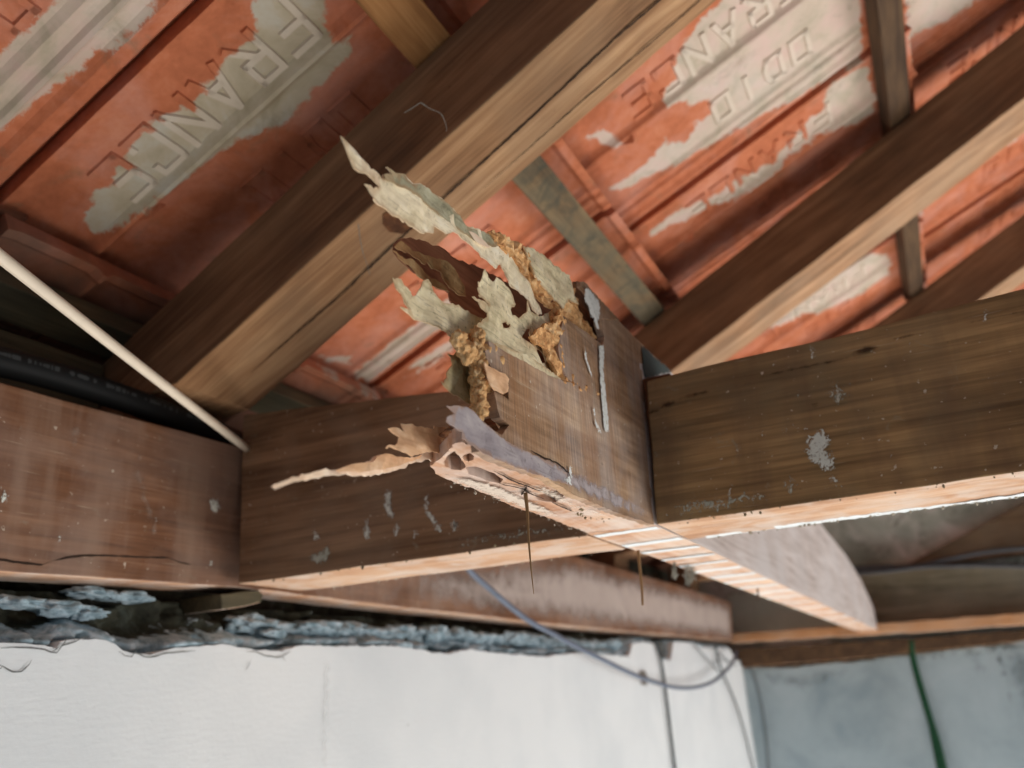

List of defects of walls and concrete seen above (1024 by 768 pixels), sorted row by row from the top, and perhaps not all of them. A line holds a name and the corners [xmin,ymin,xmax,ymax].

peeling [484,362,509,394]
peeling [385,406,570,485]
crack [0,554,191,566]
spalling [0,585,727,660]